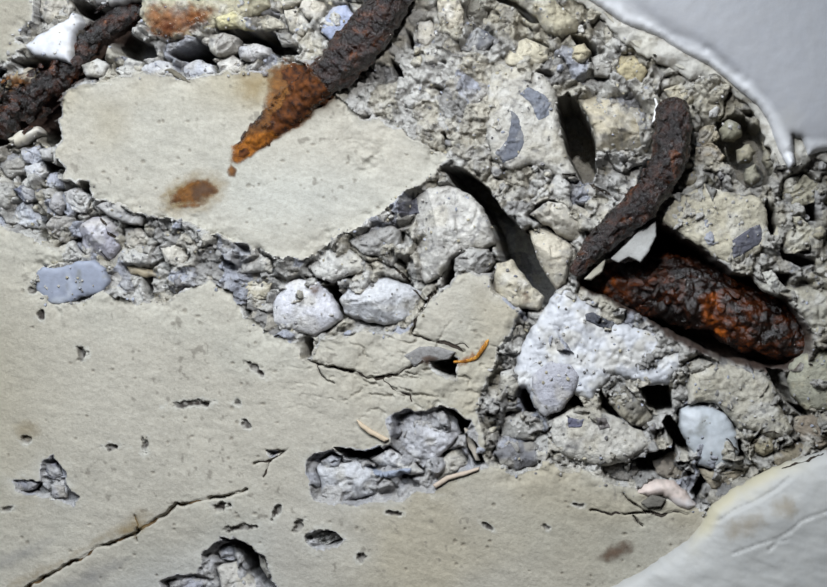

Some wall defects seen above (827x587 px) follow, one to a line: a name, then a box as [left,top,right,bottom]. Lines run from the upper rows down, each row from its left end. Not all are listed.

spalling [0,0,111,104]
rust [0,2,212,141]
rust [228,0,414,176]
rust [173,180,217,207]
rust [569,97,805,363]
spalling [243,360,265,379]
spalling [429,355,460,382]
spalling [171,398,217,411]
spalling [566,415,584,428]
spalling [12,454,80,508]
crack [28,451,284,587]
spalling [159,523,278,587]